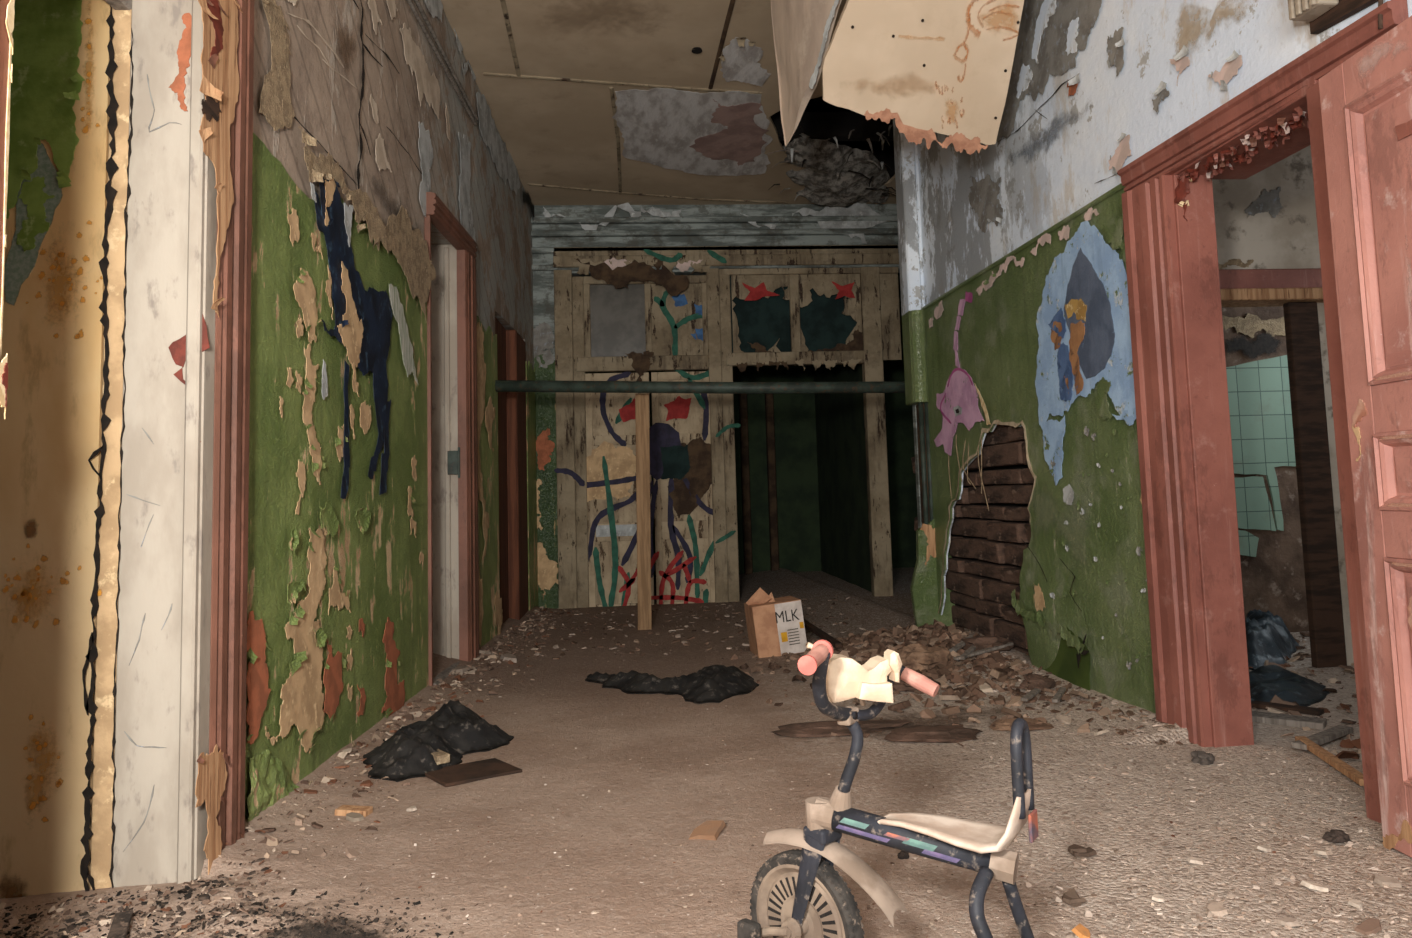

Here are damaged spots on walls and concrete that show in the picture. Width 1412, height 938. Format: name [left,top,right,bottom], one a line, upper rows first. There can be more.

flaking render [996,0,1102,147]
flaking render [1106,27,1125,77]
flaking render [1152,45,1190,114]
flaking render [1208,50,1243,90]
flaking render [1109,133,1131,176]
peeling [1174,106,1309,221]
flaking render [968,174,1003,232]
peeling [976,225,1070,295]
peeling [1222,313,1285,338]
peeling [246,0,520,753]
peeling [1061,453,1142,552]
spalling [914,420,1104,691]